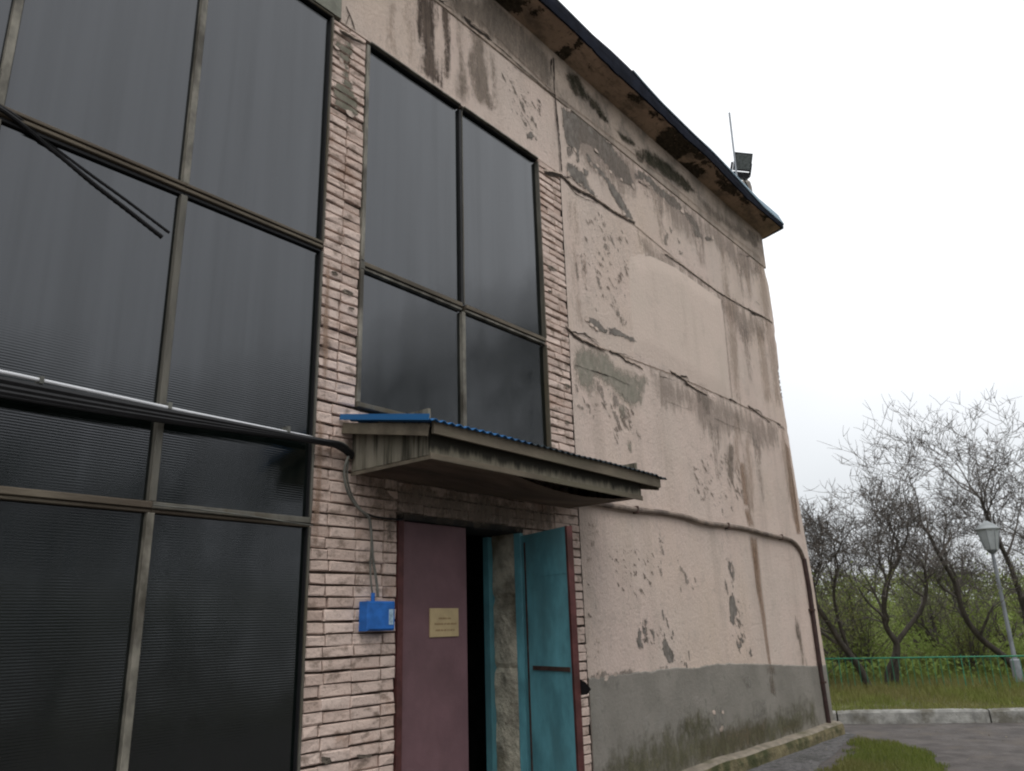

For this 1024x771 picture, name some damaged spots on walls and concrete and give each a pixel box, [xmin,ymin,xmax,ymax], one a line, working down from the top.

peeling [334,41,358,128]
leakage [417,0,549,107]
peeling [501,67,541,140]
crack [439,0,635,224]
leakage [619,133,693,192]
peeling [627,93,768,221]
peeling [562,108,714,342]
leakage [574,346,646,418]
crack [565,324,782,434]
peeling [637,610,690,669]
peeling [725,559,752,657]